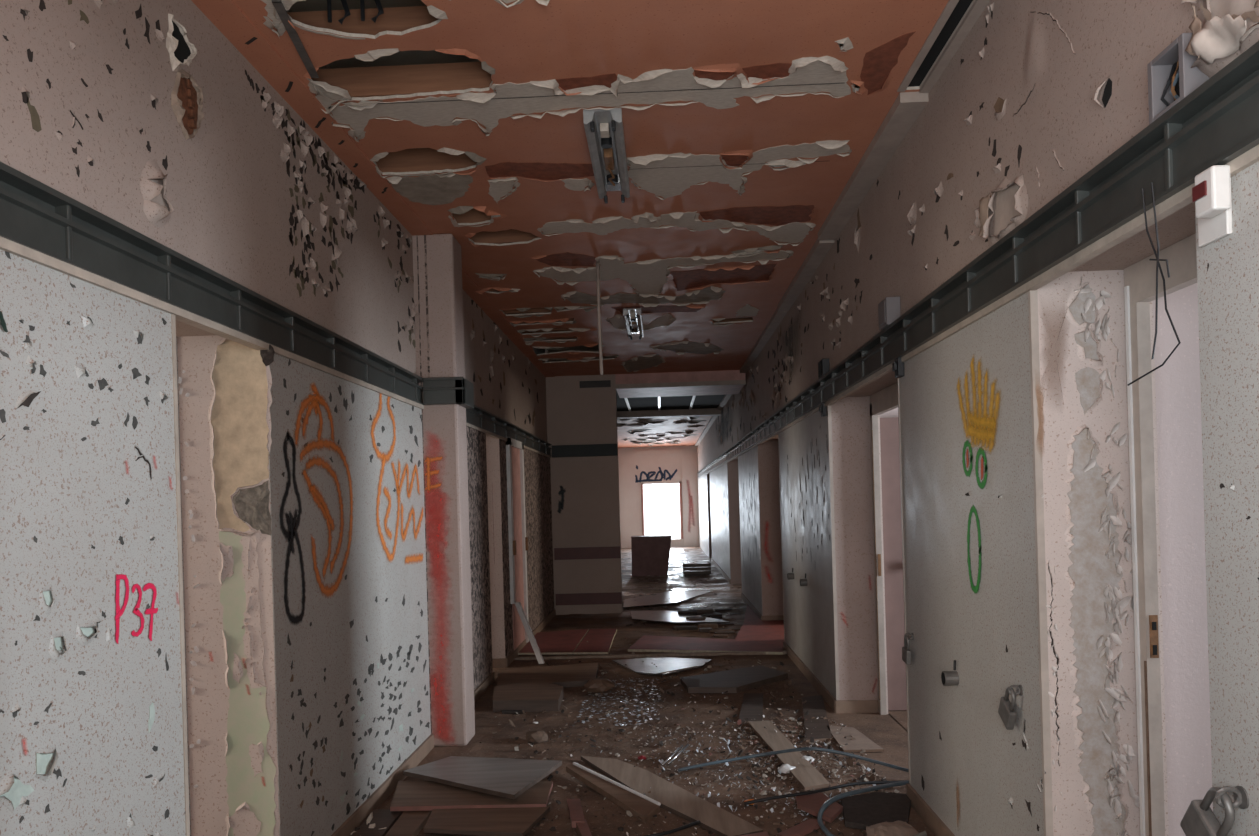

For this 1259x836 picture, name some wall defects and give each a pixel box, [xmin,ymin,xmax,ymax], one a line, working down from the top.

flaking render [123,4,204,140]
peeling [556,73,617,96]
peeling [693,63,792,85]
peeling [860,31,916,96]
spalling [1094,75,1112,112]
peeling [1181,0,1259,78]
peeling [20,86,94,177]
peeling [245,69,367,297]
peeling [483,162,594,182]
peeling [698,205,818,226]
peeling [611,264,777,315]
peeling [1064,282,1129,836]